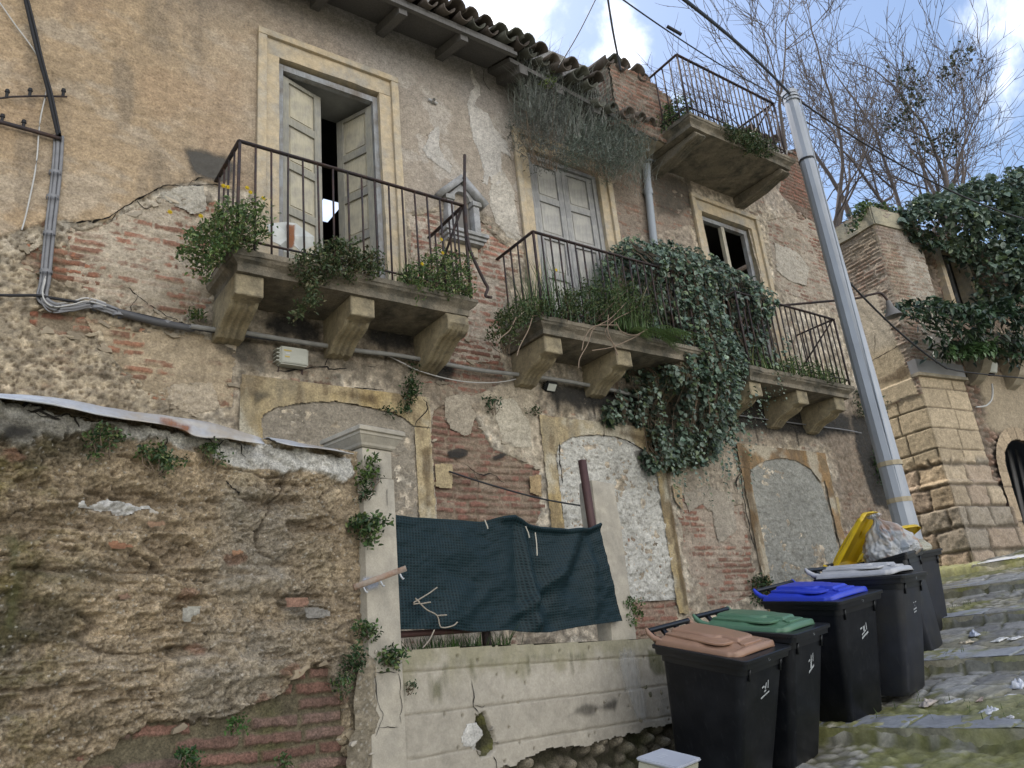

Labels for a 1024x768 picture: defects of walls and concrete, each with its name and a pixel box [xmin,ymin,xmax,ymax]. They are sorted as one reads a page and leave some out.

crack [63,177,222,223]
flaking render [18,185,240,418]
flaking render [406,68,545,525]
flaking render [677,485,760,610]
flaking render [75,650,380,768]